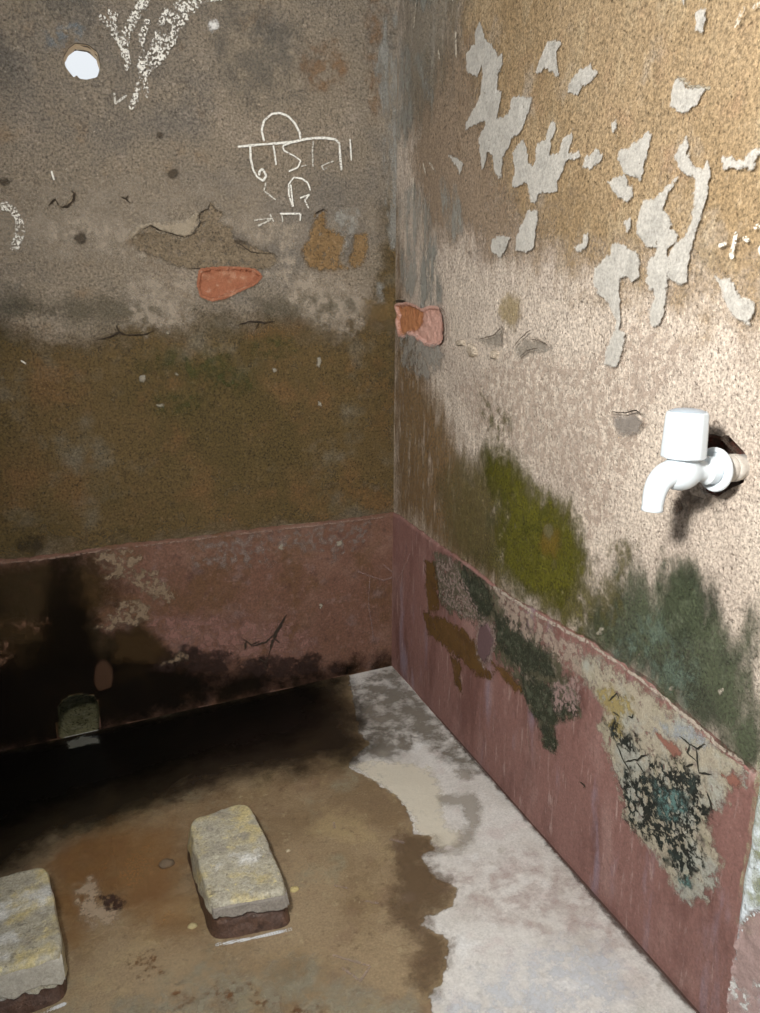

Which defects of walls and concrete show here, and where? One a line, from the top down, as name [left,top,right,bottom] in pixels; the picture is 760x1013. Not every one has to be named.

peeling [465,22,603,258]
peeling [670,77,710,113]
peeling [721,148,760,170]
flaking render [130,202,277,302]
water stain [0,0,760,764]
flaking render [377,283,444,378]
peeling [593,131,710,367]
peeling [715,277,755,325]
crack [240,615,287,670]
water stain [0,563,475,1013]
peeling [554,654,748,906]
water stain [602,712,712,889]